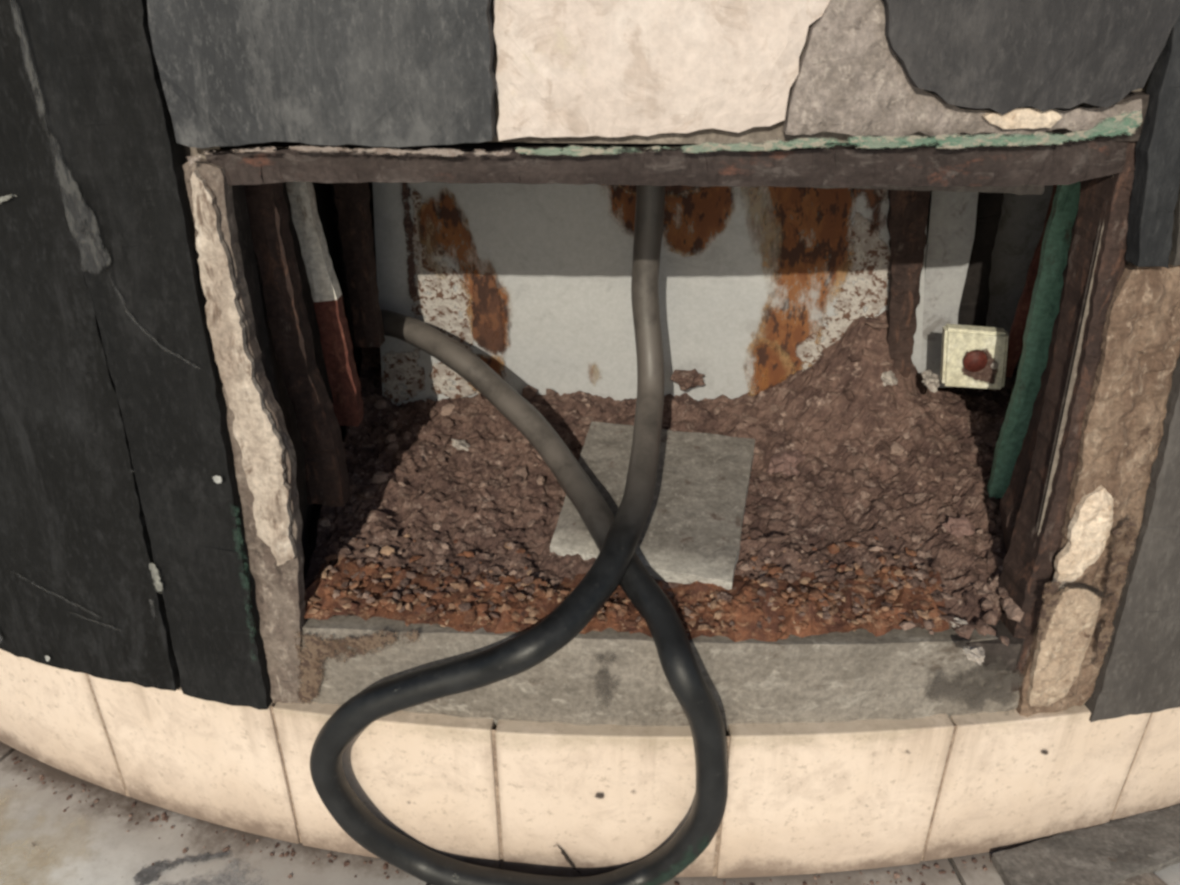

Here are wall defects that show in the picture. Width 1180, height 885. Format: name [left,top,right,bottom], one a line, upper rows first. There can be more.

peeling [190,170,297,566]
peeling [382,349,476,404]
peeling [410,190,477,351]
rust [401,182,509,379]
rust [602,185,637,234]
rust [663,185,886,396]
peeling [796,212,891,371]
spalling [1016,263,1180,717]